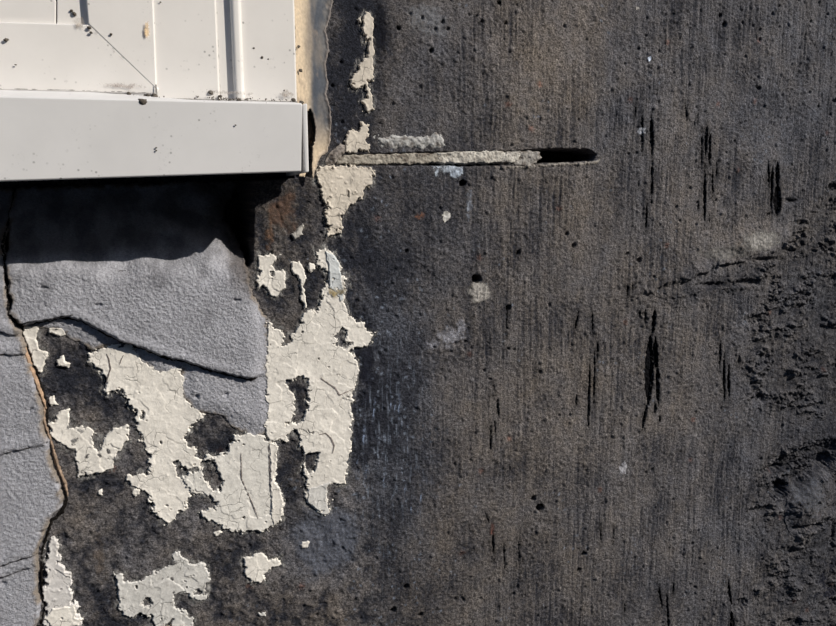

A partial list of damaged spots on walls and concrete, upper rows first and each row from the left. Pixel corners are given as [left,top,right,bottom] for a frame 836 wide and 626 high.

peeling [343,11,379,154]
peeling [19,325,71,375]
crack [0,188,261,626]
peeling [48,161,376,536]
peeling [112,551,211,626]
peeling [241,551,285,585]